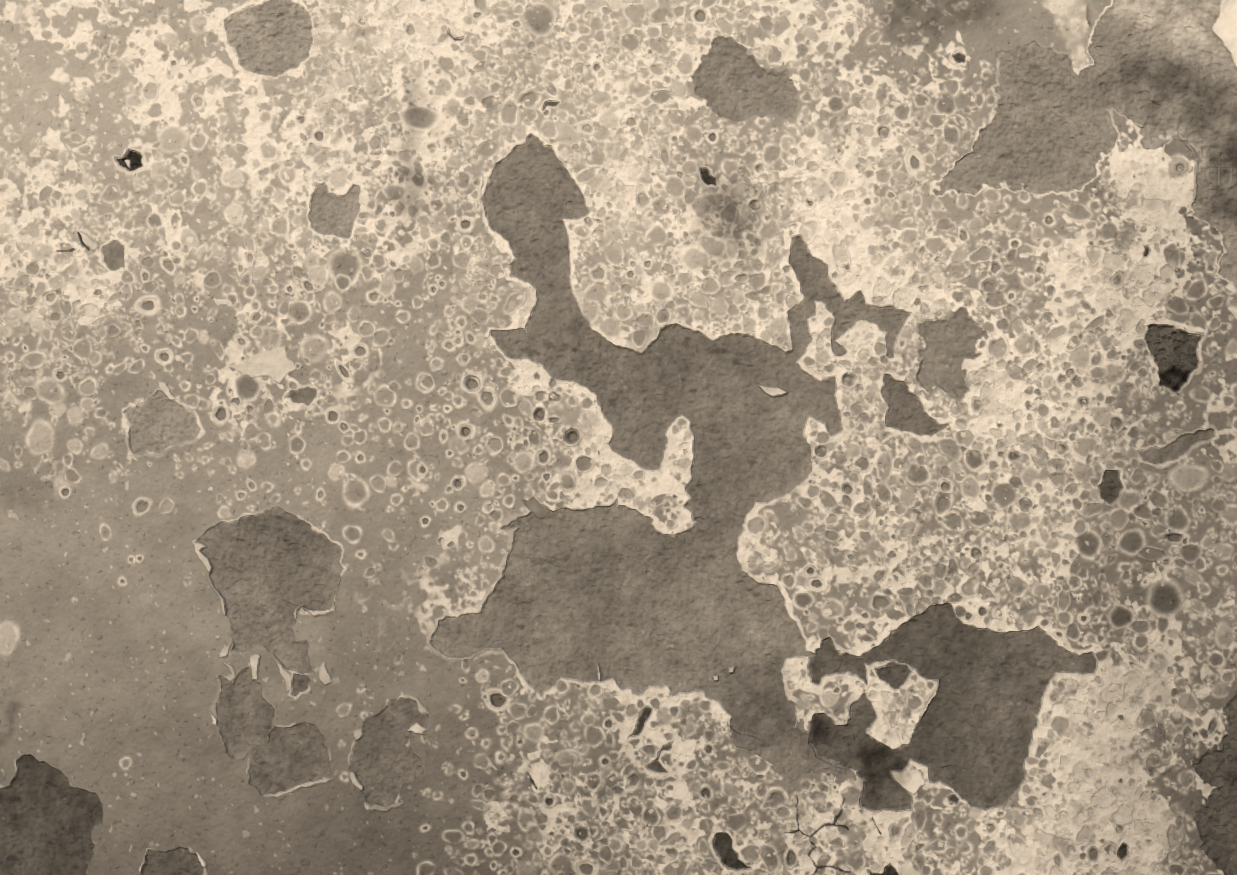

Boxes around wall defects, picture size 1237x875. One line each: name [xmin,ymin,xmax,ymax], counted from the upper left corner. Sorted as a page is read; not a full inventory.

peeling [225,0,313,77]
peeling [691,37,798,122]
peeling [933,0,1237,288]
peeling [309,184,362,239]
spalling [1144,319,1206,394]
peeling [431,134,1098,813]
peeling [194,505,344,798]
peeling [350,695,431,812]
peeling [0,756,103,875]
peeling [139,848,207,875]